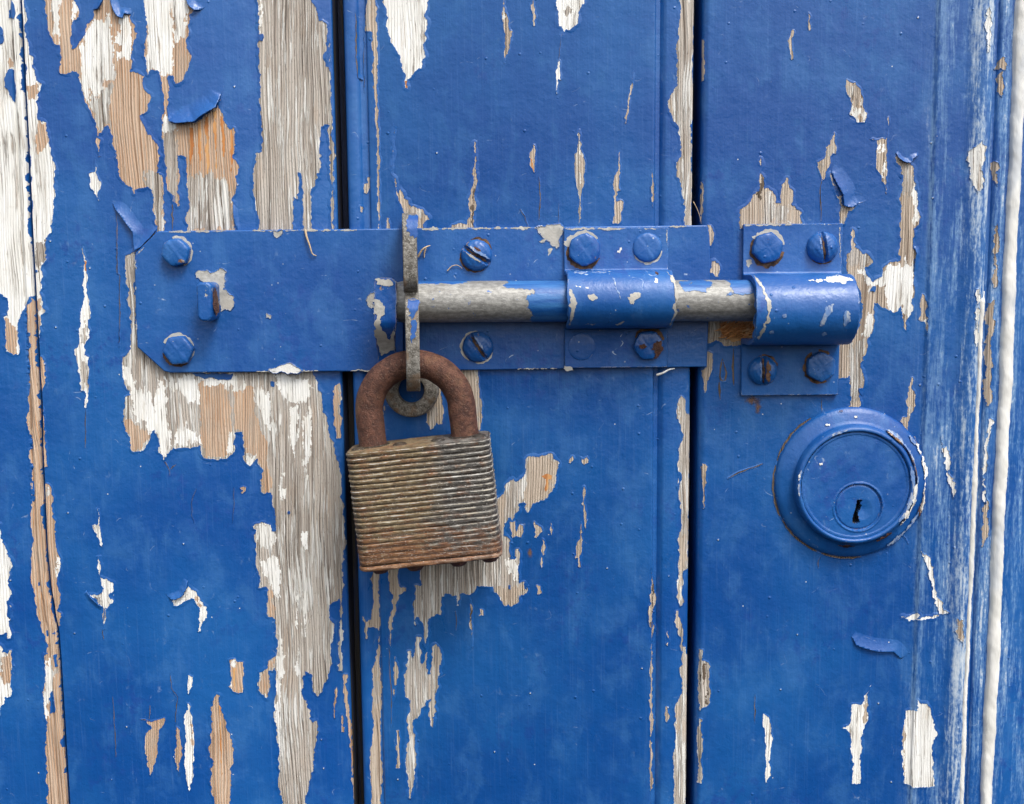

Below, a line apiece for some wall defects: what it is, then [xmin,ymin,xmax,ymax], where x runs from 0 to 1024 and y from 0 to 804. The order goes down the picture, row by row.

peeling [0,0,354,804]
peeling [358,0,433,229]
corrosion [639,341,663,359]
peeling [666,0,723,280]
peeling [700,259,787,396]
peeling [736,156,805,241]
peeling [809,116,930,418]
peeling [361,452,590,804]
peeling [841,685,873,786]
peeling [898,698,941,790]